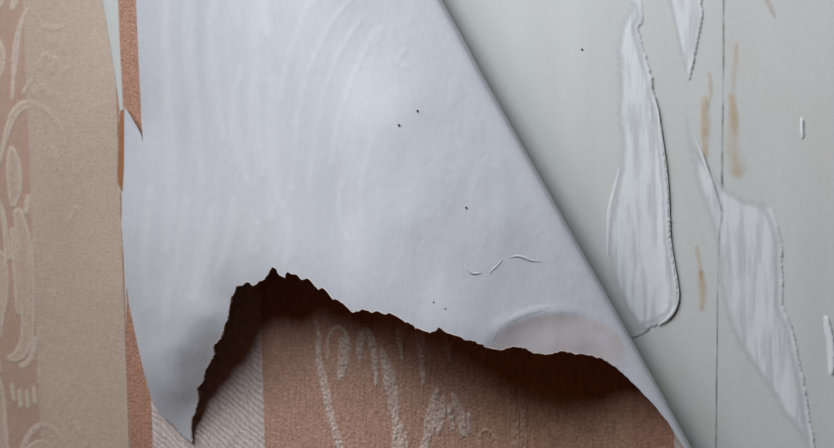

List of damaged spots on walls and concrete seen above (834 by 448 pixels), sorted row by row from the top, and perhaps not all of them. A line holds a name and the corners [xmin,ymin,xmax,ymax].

flaking render [606,0,679,330]
flaking render [670,0,704,82]
flaking render [693,135,816,448]
flaking render [823,315,834,377]